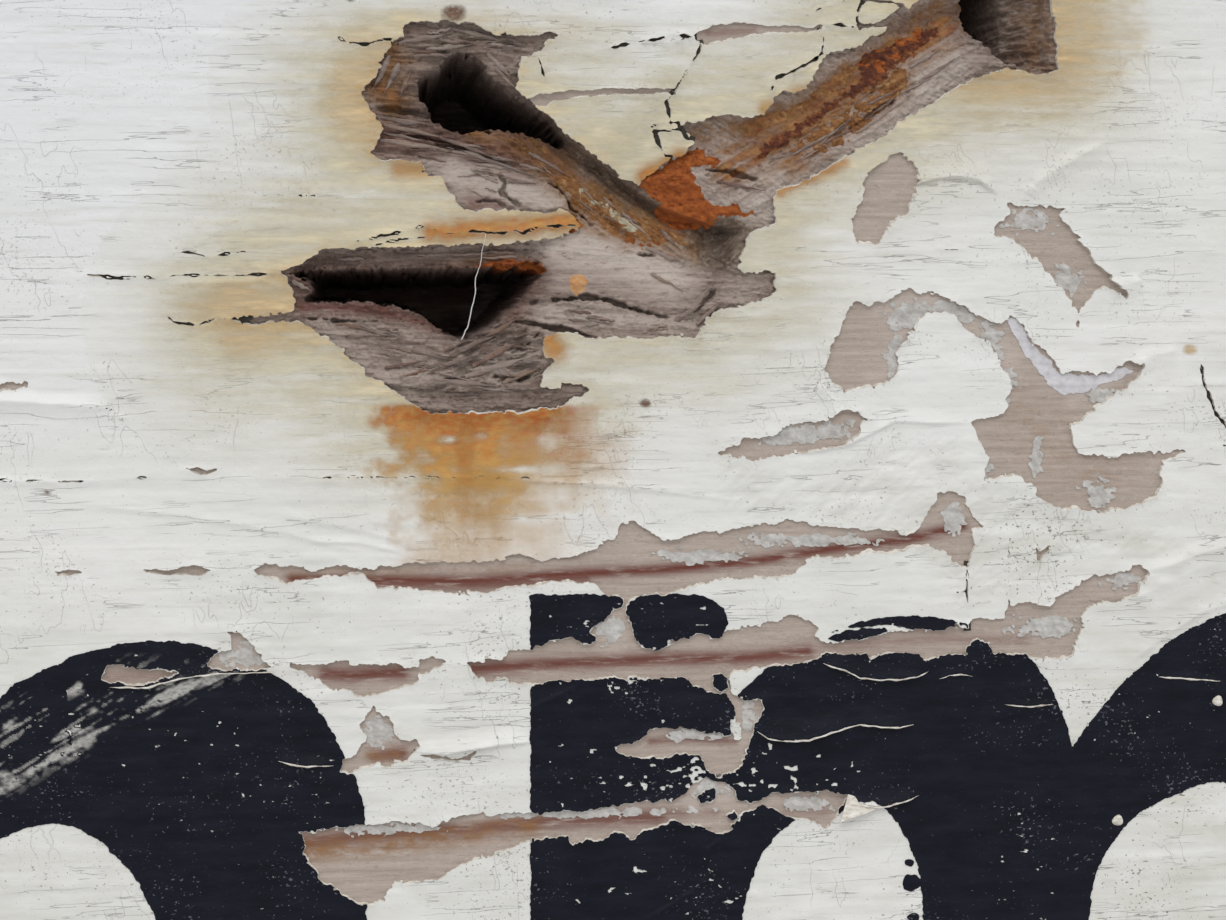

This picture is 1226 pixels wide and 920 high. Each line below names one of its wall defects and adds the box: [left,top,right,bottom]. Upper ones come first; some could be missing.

crack [611,33,704,160]
rust [425,0,957,251]
crack [771,0,865,89]
rust [963,0,1101,97]
peeling [526,233,776,339]
peeling [994,203,1127,326]
rust [373,405,582,520]
peeling [718,409,866,461]
peeling [824,288,1184,513]
crack [1200,365,1226,446]
peeling [102,632,273,713]
peeling [255,491,1148,903]